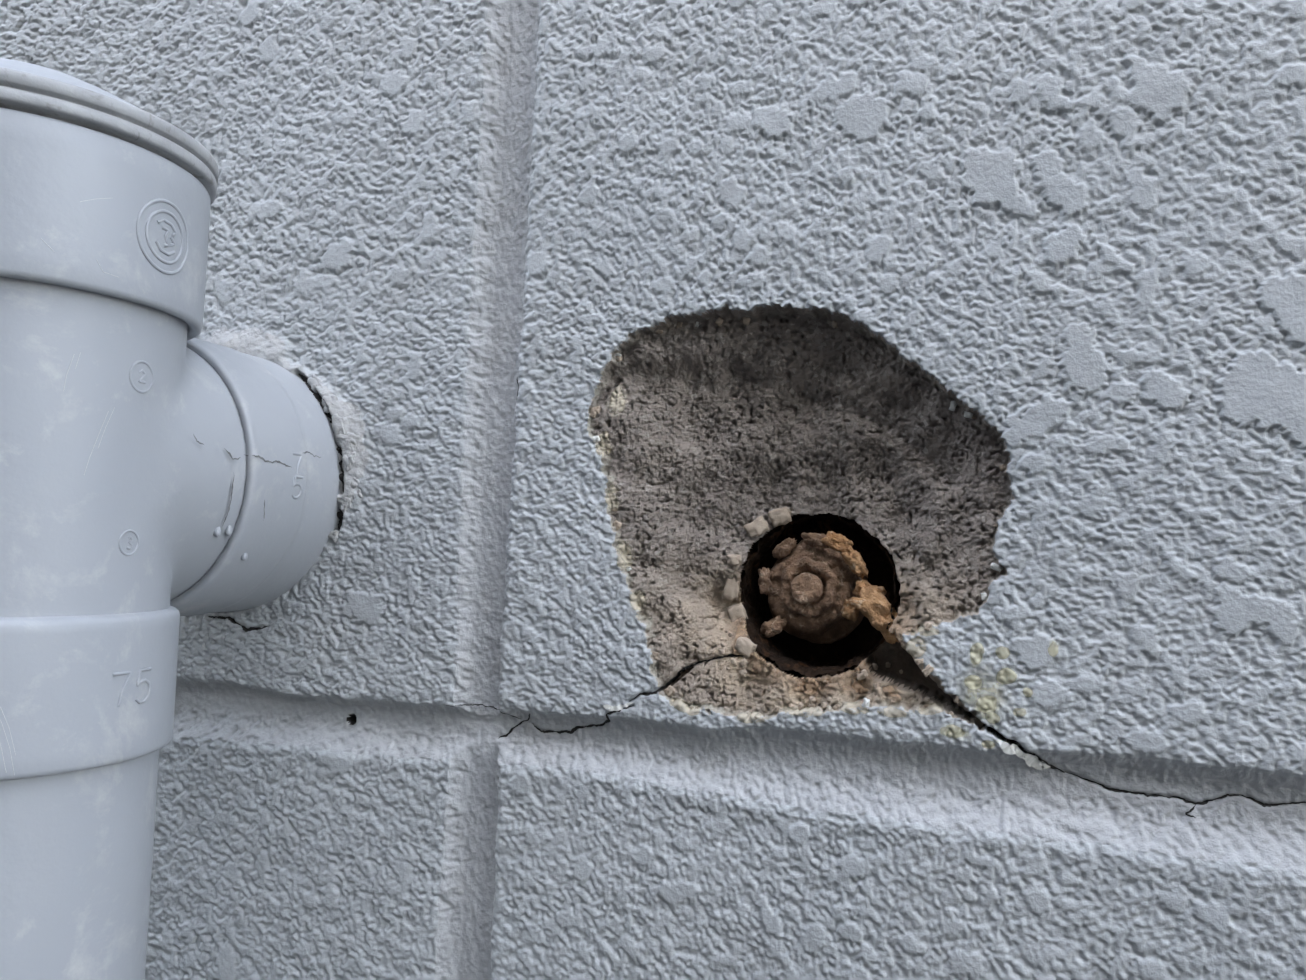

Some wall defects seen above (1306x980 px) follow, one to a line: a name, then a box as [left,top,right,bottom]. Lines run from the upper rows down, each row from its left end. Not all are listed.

spalling [587,304,1050,770]
crack [446,654,743,738]
rust [734,596,897,698]
crack [866,640,1306,818]